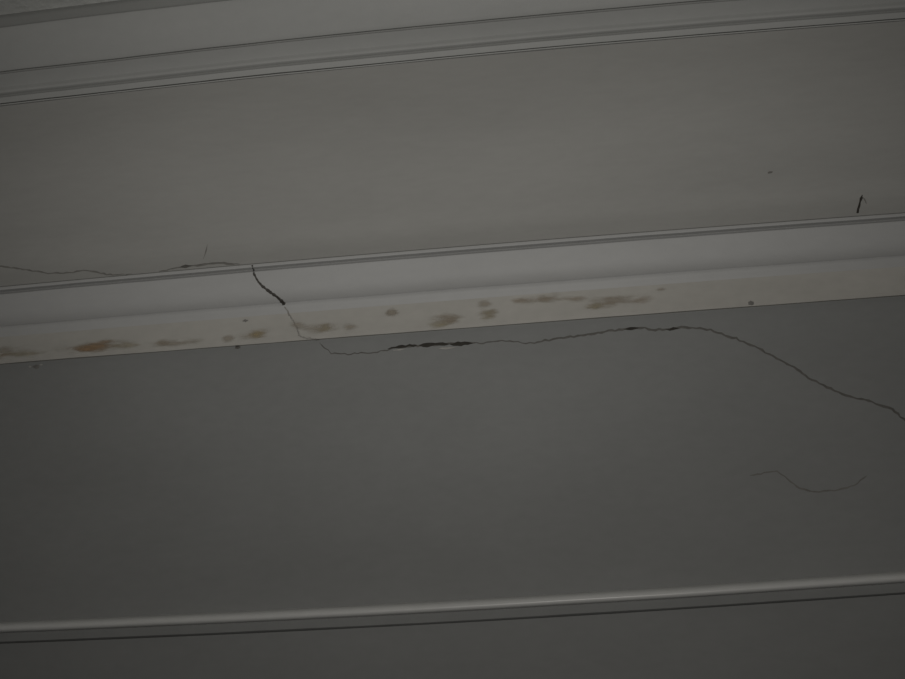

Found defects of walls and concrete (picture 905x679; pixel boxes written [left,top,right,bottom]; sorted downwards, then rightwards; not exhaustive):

crack [856,195,867,213]
crack [0,265,128,276]
crack [159,247,905,421]